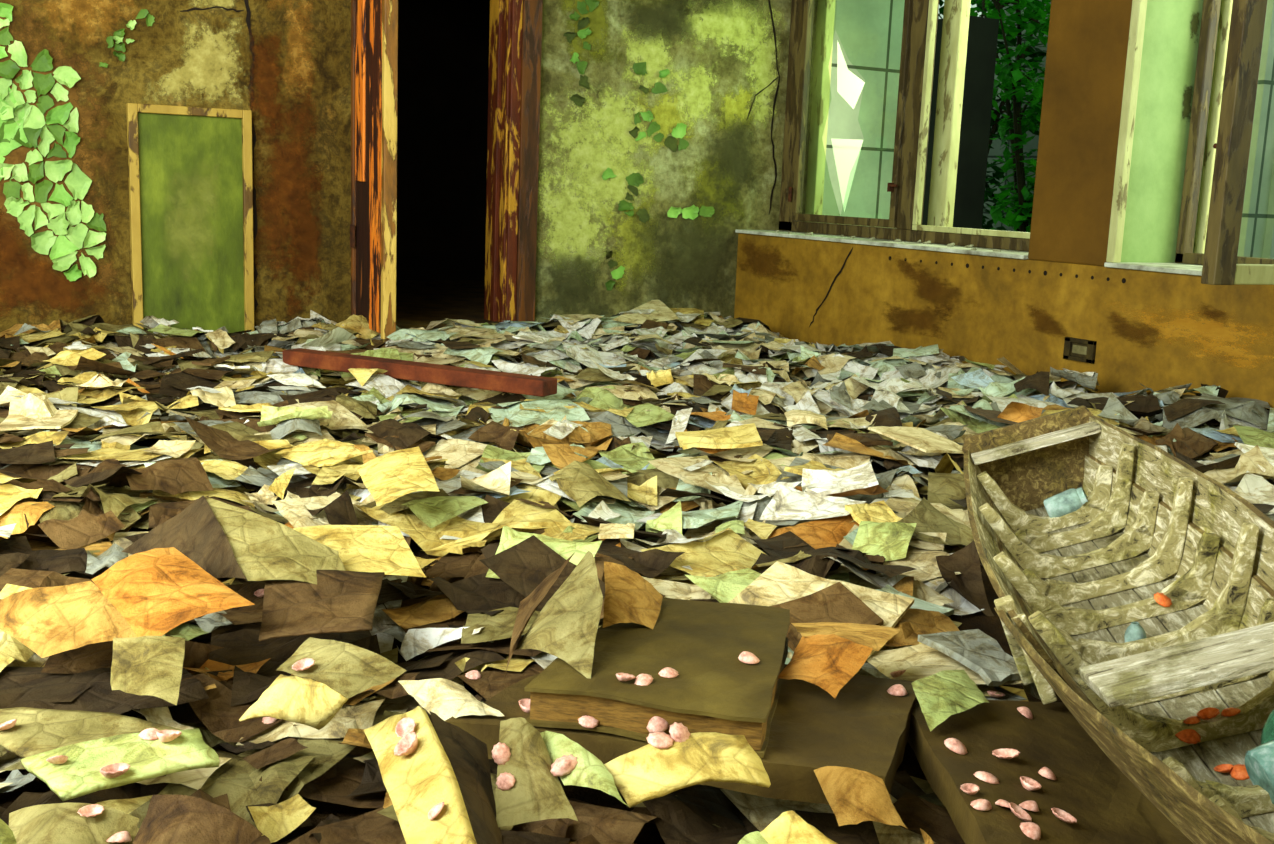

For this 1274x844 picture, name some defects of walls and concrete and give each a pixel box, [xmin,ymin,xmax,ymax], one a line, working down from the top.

flaking render [149,0,242,103]
peeling [0,0,155,299]
crack [180,0,258,311]
water stain [535,0,790,318]
crack [809,248,853,327]
water stain [887,260,958,333]
water stain [1114,315,1156,344]